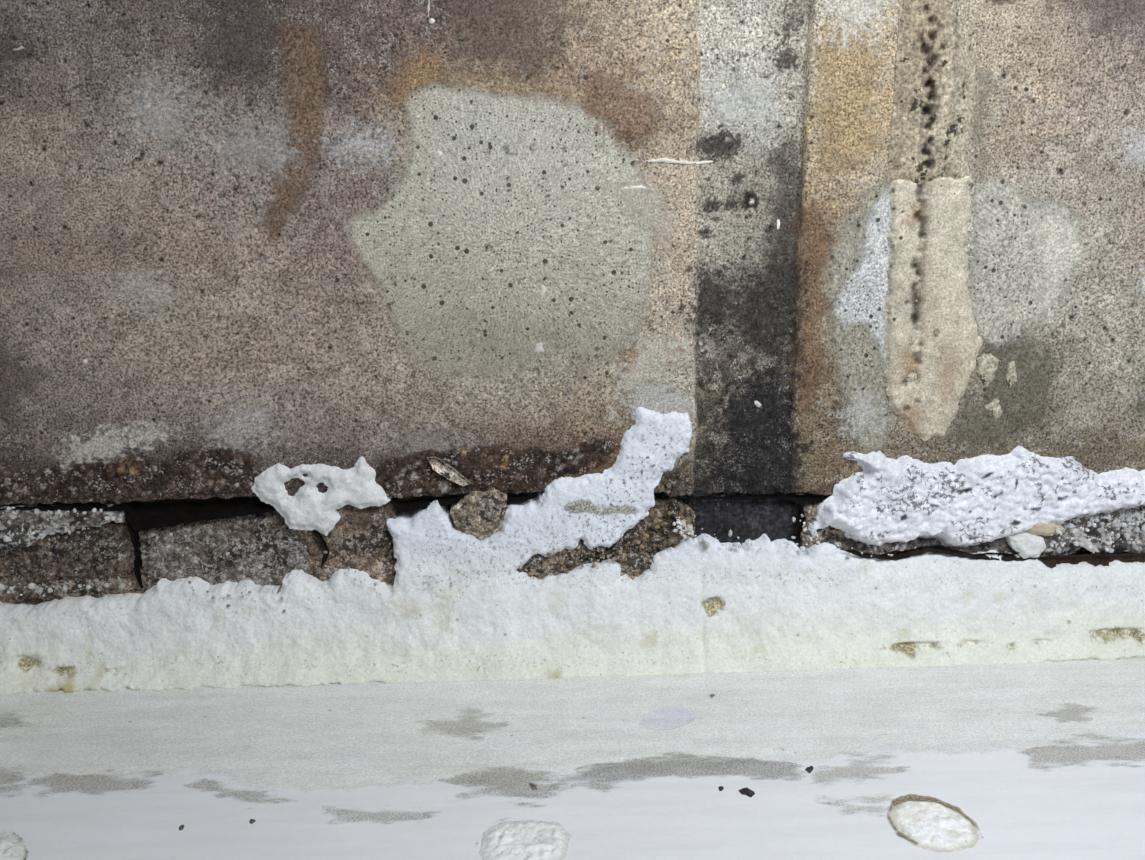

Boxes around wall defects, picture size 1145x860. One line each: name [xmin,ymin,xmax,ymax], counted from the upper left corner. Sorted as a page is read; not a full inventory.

corrosion [269,21,324,239]
damp [686,0,899,239]
damp [211,85,814,512]
corrosion [788,204,833,409]
spalling [0,438,618,586]
spalling [662,460,694,496]